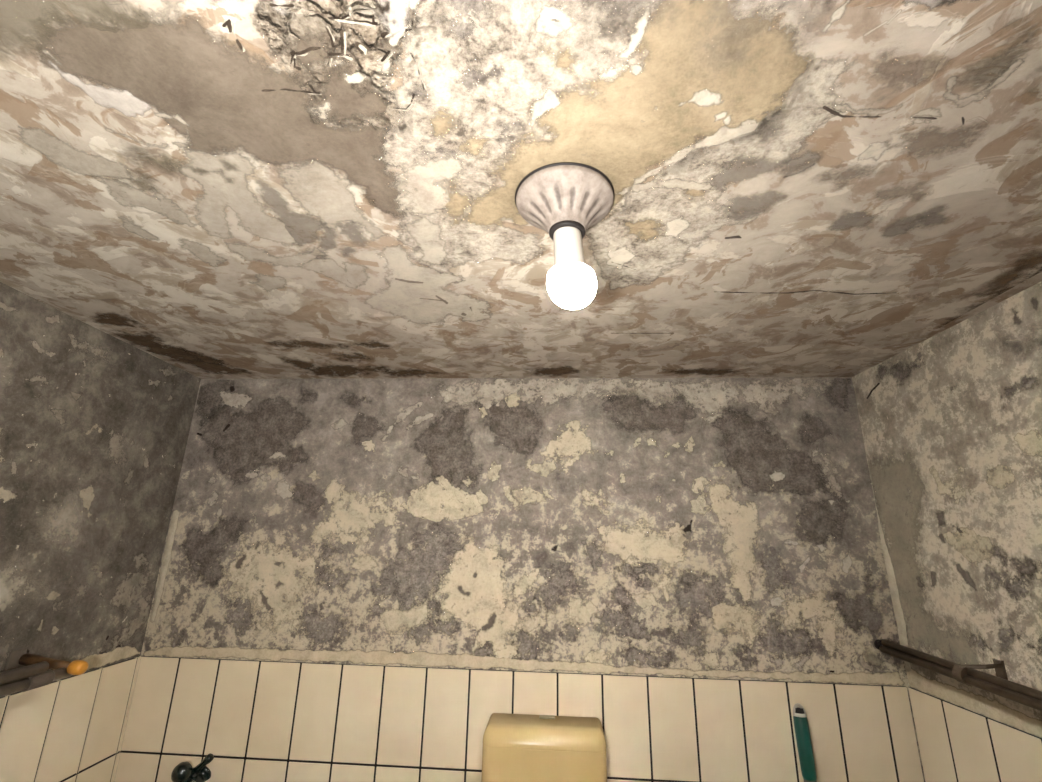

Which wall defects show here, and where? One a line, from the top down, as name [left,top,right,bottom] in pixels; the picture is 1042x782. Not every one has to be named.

peeling [18,0,854,324]
peeling [0,486,18,502]
peeling [220,386,253,409]
damp [196,380,325,512]
peeling [223,461,554,633]
damp [368,523,468,646]
damp [414,400,541,488]
peeling [525,420,614,477]
peeling [568,596,598,628]
damp [593,562,724,668]
damp [713,407,848,546]
damp [868,452,1042,673]